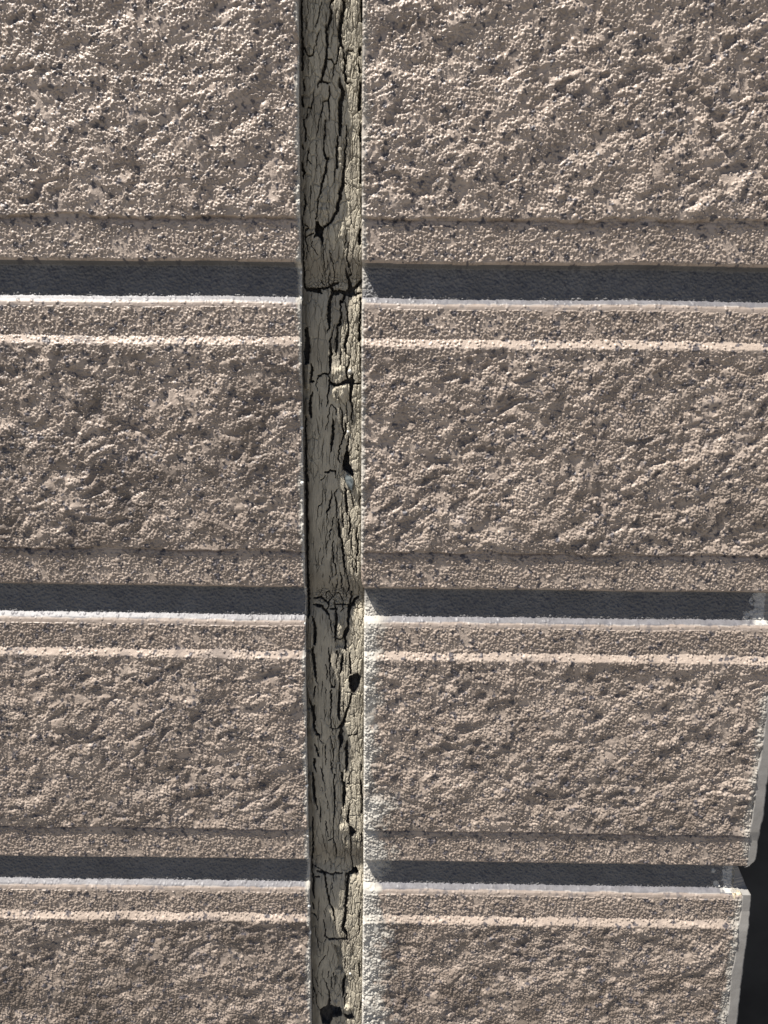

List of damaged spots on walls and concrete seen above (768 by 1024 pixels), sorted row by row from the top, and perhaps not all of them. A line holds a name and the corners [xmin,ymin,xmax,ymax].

crack [304,0,362,1007]